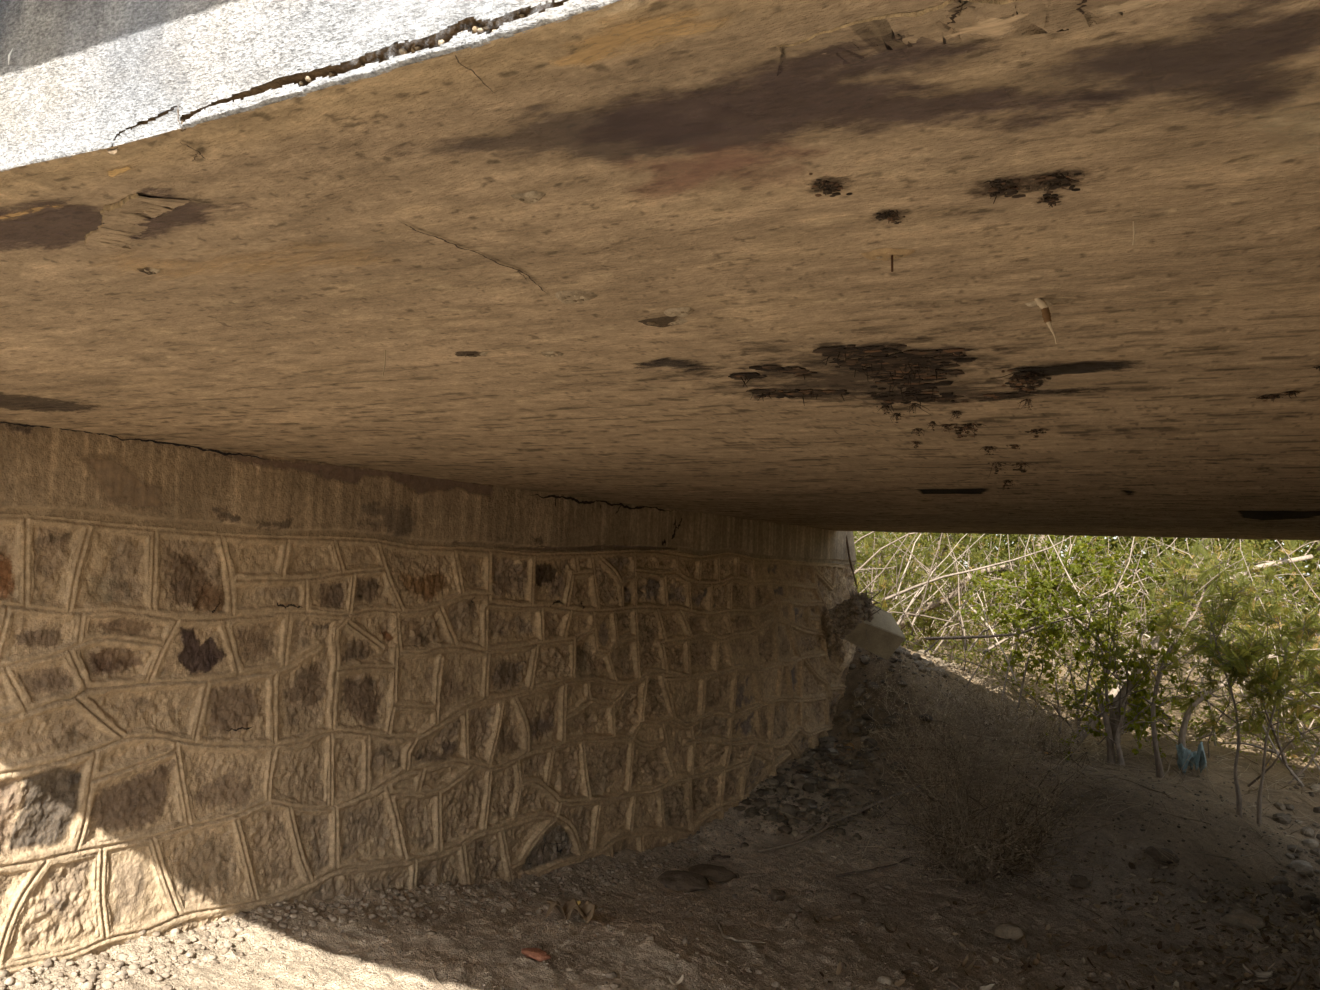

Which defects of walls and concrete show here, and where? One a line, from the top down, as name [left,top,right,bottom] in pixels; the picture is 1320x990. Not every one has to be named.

peeling [955,13,1026,36]
peeling [1100,0,1162,14]
crack [107,0,569,162]
water stain [438,0,1320,162]
water stain [0,201,103,251]
crack [84,193,190,251]
water stain [129,189,236,239]
water stain [0,392,97,434]